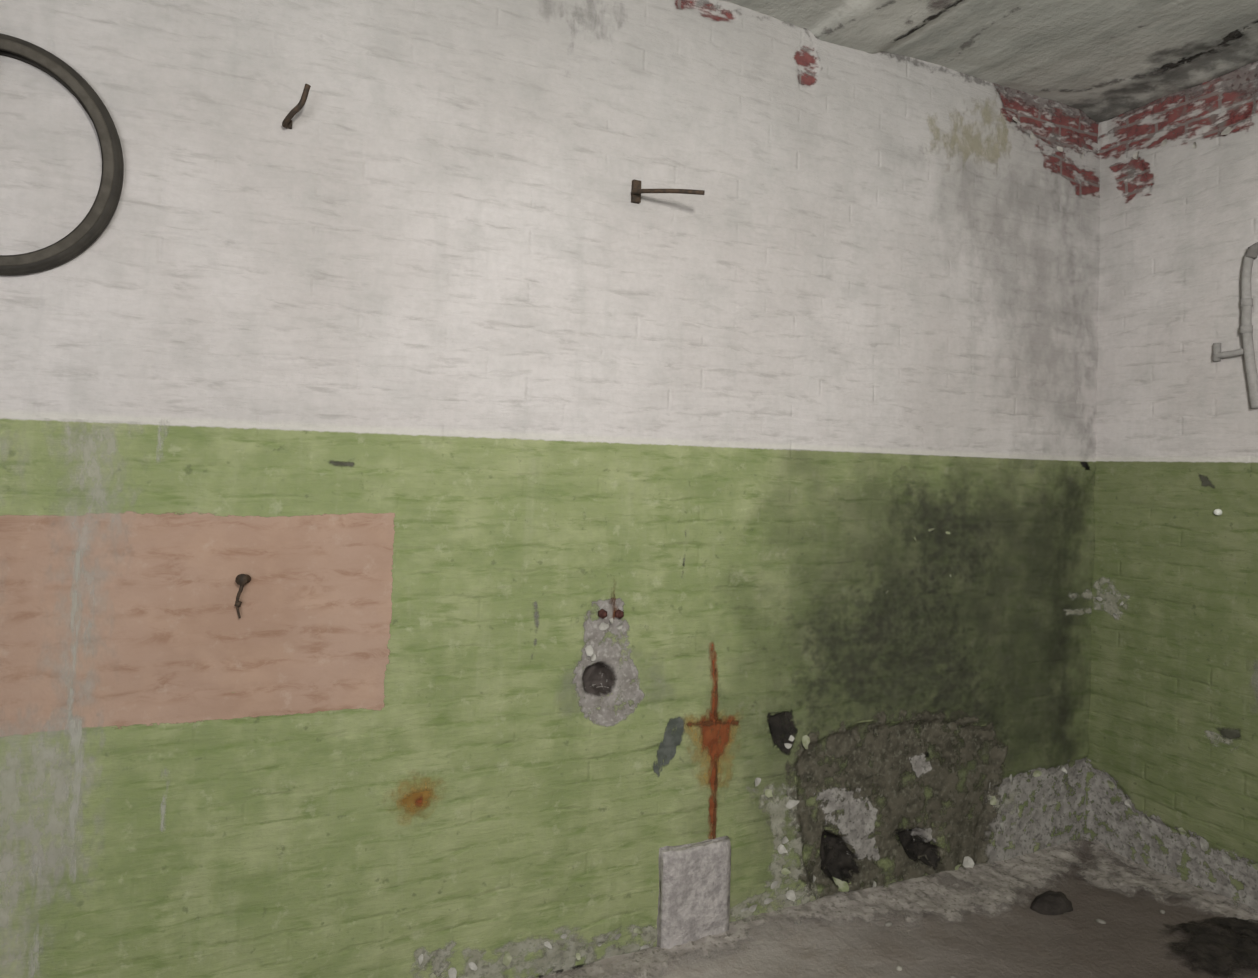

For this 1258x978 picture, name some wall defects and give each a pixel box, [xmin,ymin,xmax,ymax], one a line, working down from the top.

flaking render [675,0,734,21]
flaking render [794,46,816,86]
flaking render [994,61,1258,203]
corrosion [399,781,434,814]
corrosion [686,643,739,839]
spalling [730,710,1258,922]